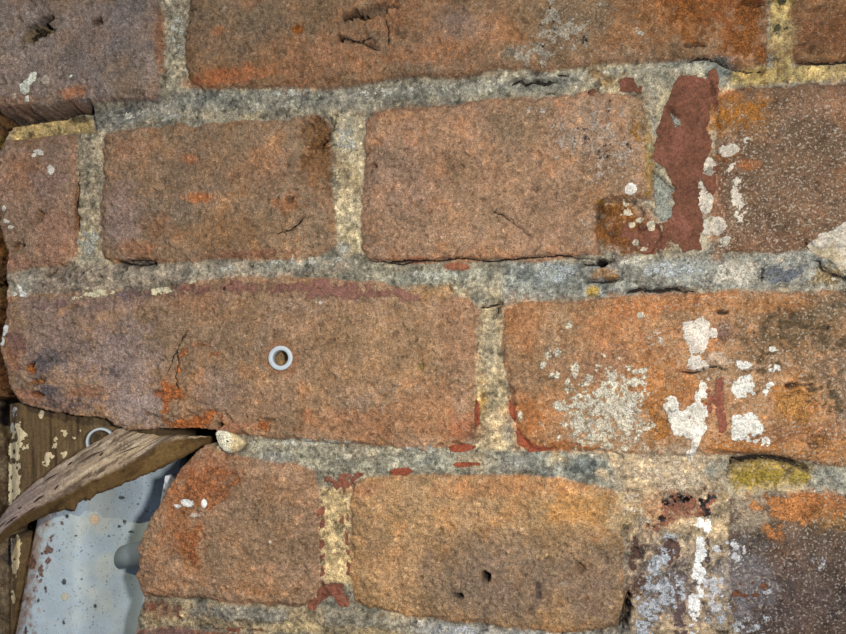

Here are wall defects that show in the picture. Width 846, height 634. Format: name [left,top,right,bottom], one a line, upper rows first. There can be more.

crack [167,334,186,390]
water stain [540,316,774,495]